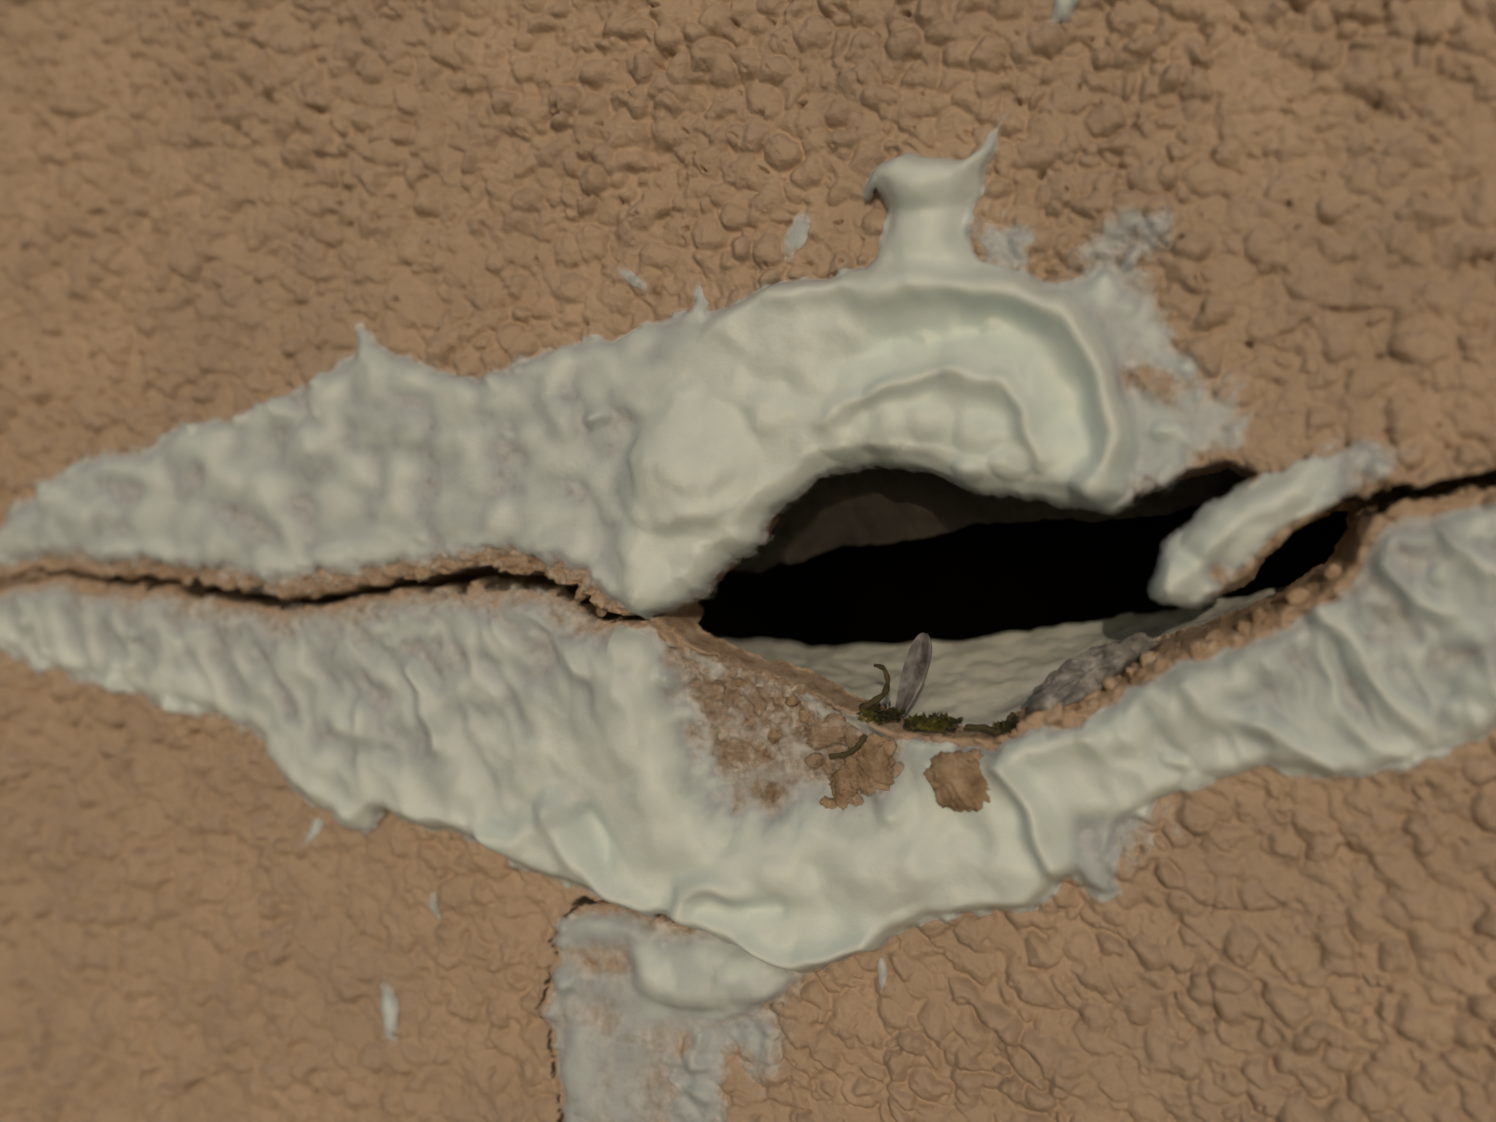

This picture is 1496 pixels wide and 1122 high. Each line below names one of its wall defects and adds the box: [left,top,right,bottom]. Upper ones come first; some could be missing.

crack [0,548,666,623]
spalling [666,505,1202,812]
spalling [1028,511,1363,717]
crack [1207,468,1496,595]
crack [535,896,675,1122]